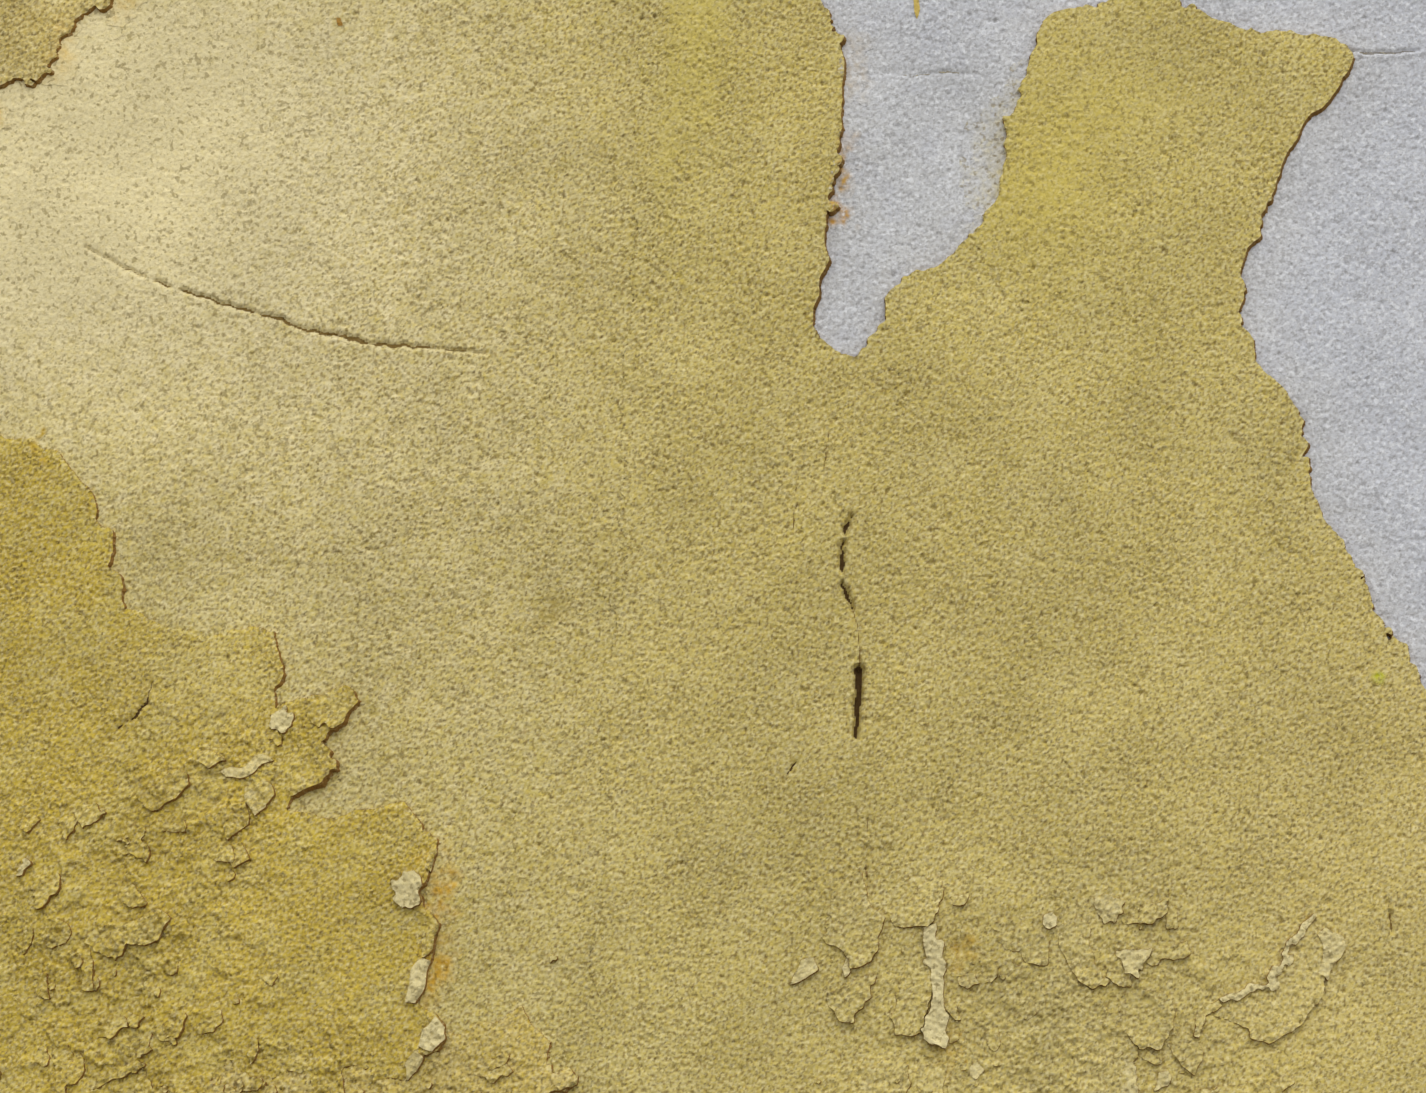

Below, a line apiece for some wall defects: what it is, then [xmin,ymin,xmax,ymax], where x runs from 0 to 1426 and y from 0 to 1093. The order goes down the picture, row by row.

spalling [813,0,1108,357]
crack [91,250,475,353]
spalling [1180,0,1426,689]
peeling [0,0,645,1093]
crack [840,517,862,739]
peeling [790,957,819,985]
peeling [821,871,1346,1093]